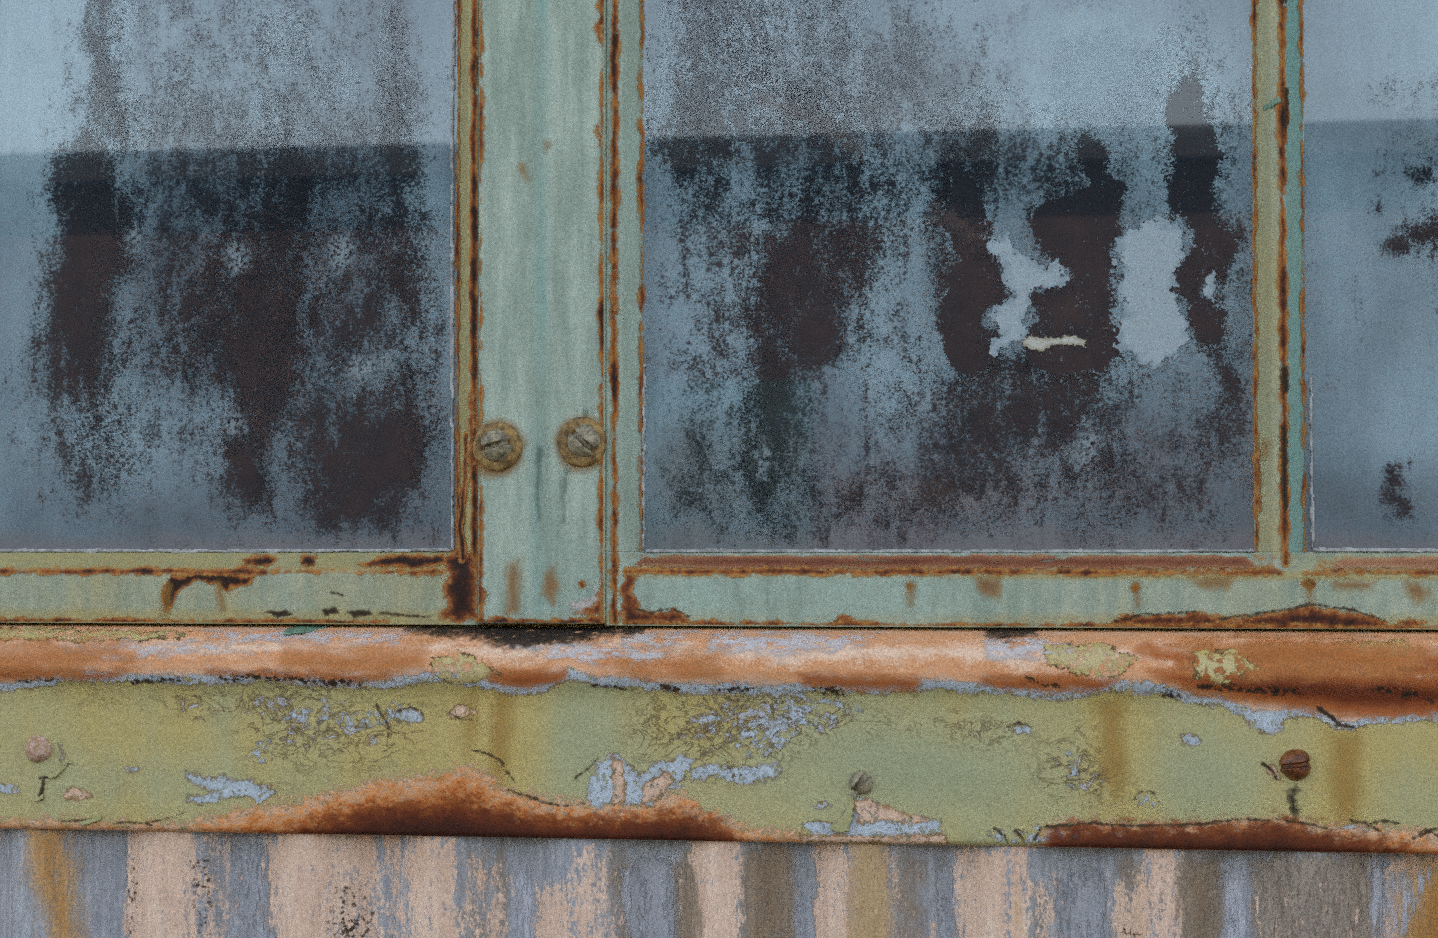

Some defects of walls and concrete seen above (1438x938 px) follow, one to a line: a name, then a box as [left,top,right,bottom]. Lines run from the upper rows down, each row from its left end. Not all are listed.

leakage [4,0,451,545]
rust [0,0,1438,629]
leakage [645,0,1253,547]
leakage [1372,132,1438,285]
leakage [1379,458,1414,520]
peeling [0,624,1438,810]
peeling [232,839,275,938]
rust [0,762,824,938]
rust [848,843,891,938]
peeling [794,793,949,938]
peeling [1054,863,1113,938]
rust [1036,814,1438,938]